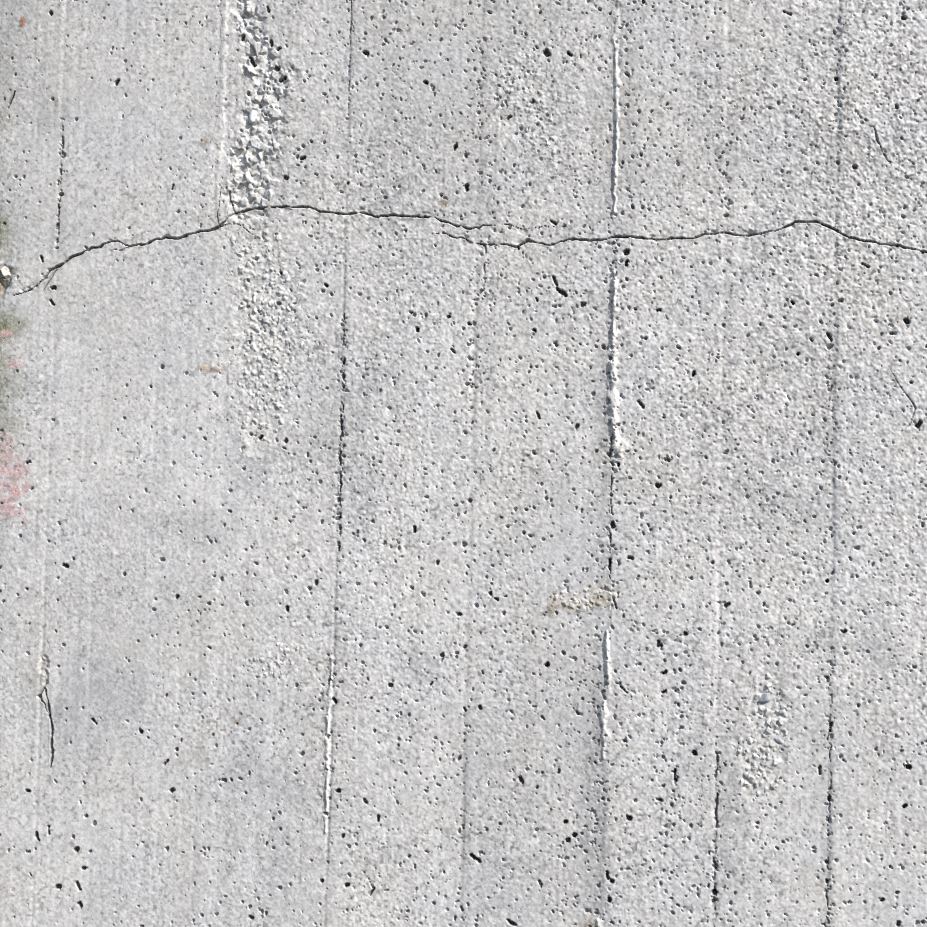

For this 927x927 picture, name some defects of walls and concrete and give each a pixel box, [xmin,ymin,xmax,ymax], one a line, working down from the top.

crack [24,191,927,293]